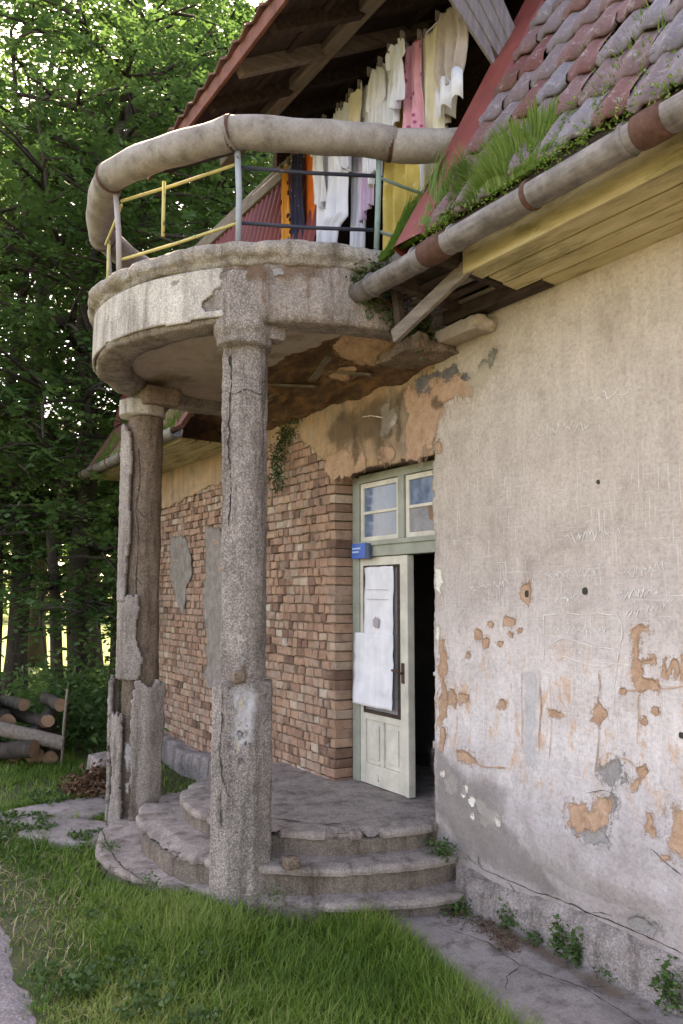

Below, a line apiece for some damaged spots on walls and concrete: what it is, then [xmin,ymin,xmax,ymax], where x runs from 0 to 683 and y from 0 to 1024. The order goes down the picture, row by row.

crack [226,355,263,526]
peeling [323,362,474,484]
peeling [434,567,444,594]
peeling [519,579,533,607]
peeling [434,625,504,769]
peeling [562,672,649,852]
peeling [638,706,661,727]
crack [468,855,682,954]